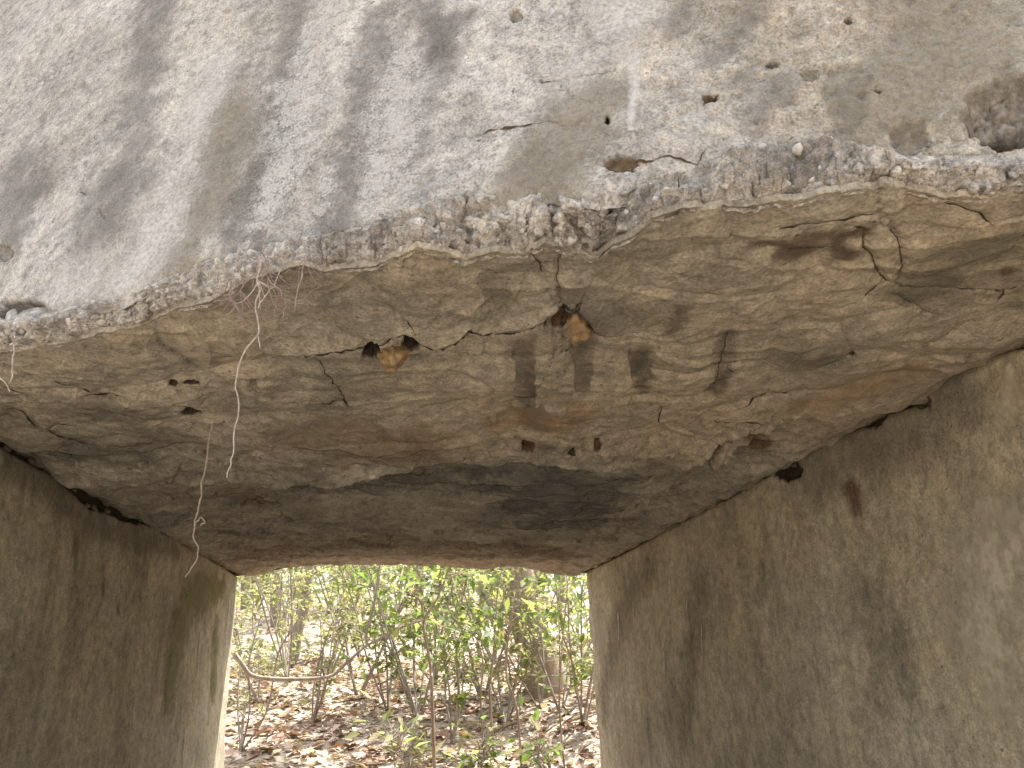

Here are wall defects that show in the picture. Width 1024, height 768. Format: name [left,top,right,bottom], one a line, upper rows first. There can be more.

damp [316,1,469,232]
crack [483,122,552,135]
damp [499,0,664,199]
crack [635,151,705,165]
spalling [0,82,1024,353]
crack [780,213,1017,313]
crack [946,203,993,226]
crack [304,254,598,406]
crack [712,331,735,389]